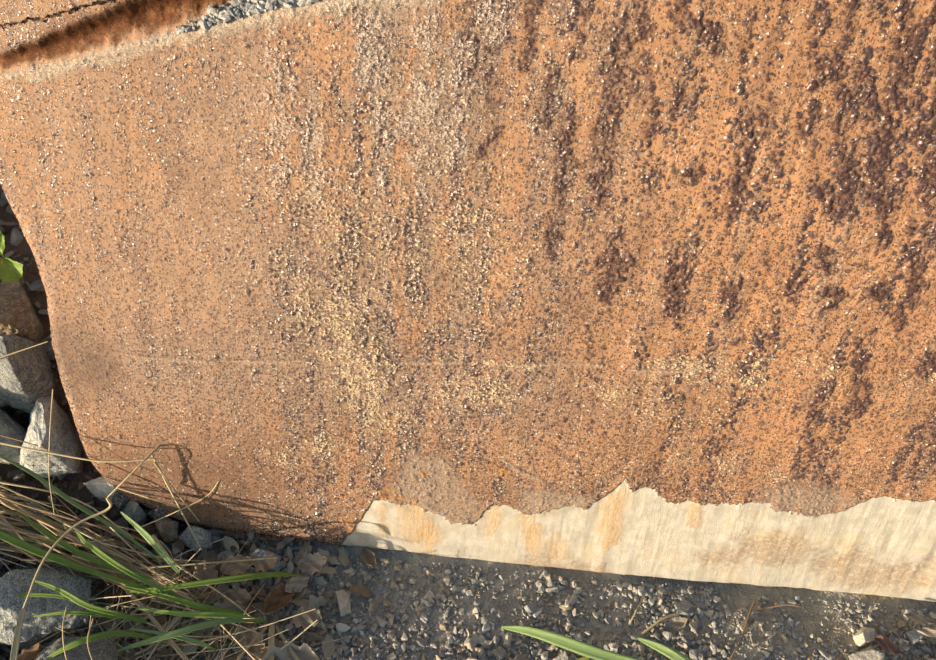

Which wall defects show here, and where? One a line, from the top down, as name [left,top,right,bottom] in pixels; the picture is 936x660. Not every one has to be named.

crack [0,0,115,29]
corrosion [0,0,231,68]
spalling [340,480,936,602]